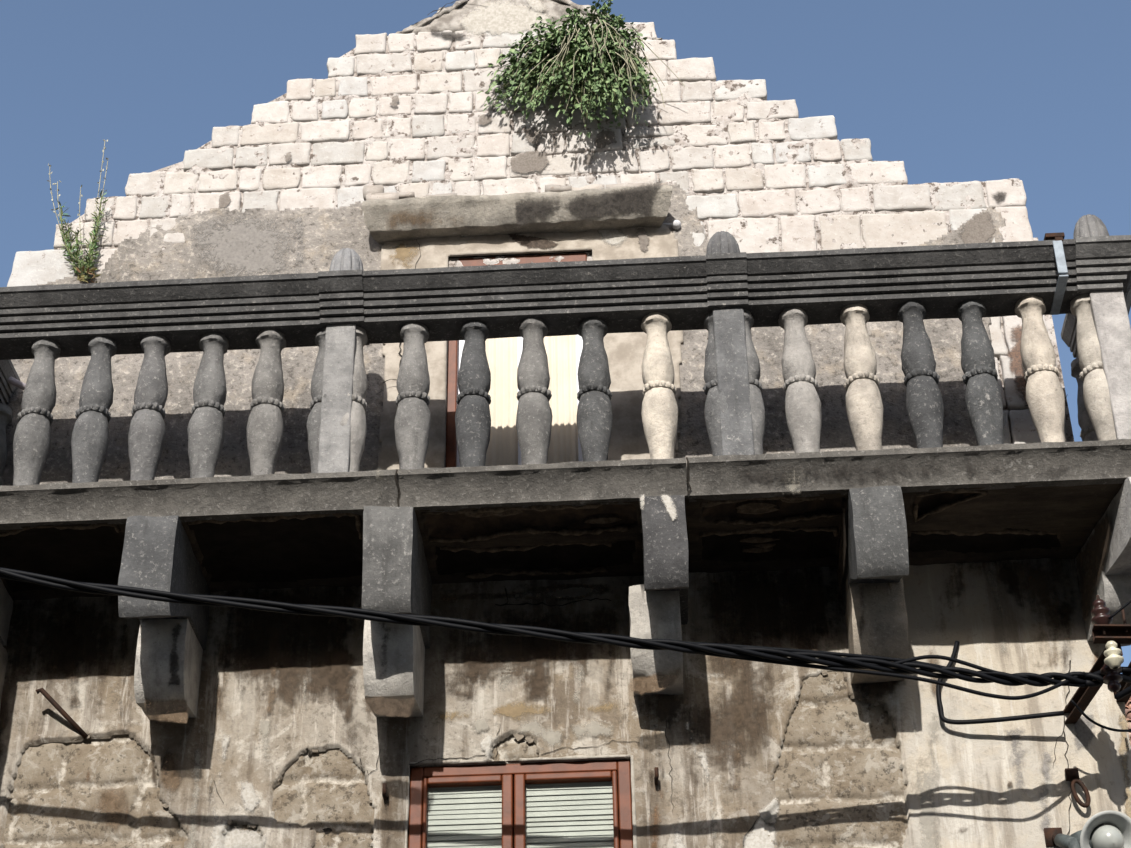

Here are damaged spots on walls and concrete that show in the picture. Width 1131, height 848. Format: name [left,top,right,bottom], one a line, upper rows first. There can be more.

spalling [422,495,645,543]
peeling [661,495,677,520]
water stain [947,514,1109,636]
flaking render [4,734,188,848]
water stain [145,699,187,723]
flaking render [210,815,266,848]
flaking render [241,748,375,848]
water stain [219,586,414,757]
water stain [441,584,617,720]
water stain [629,566,842,789]
flaking render [744,670,908,848]
water stain [1074,715,1095,749]